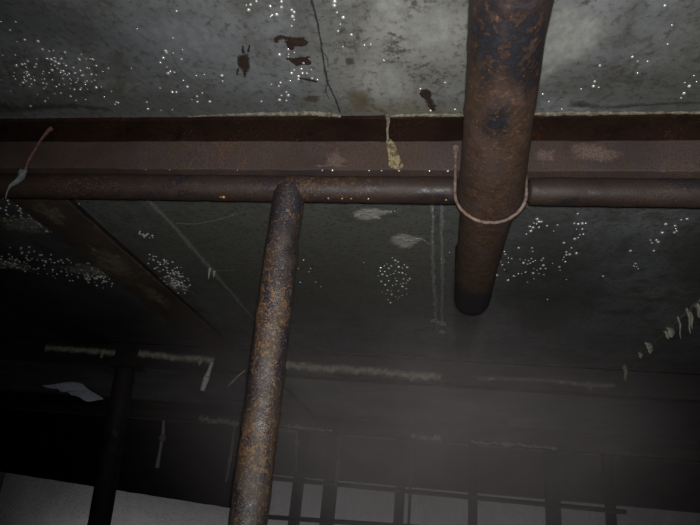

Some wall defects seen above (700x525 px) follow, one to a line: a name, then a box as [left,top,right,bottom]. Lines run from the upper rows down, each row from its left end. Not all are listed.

crack [311,0,340,112]
leakage [385,113,464,169]
leakage [430,204,446,334]
peeling [622,299,700,381]